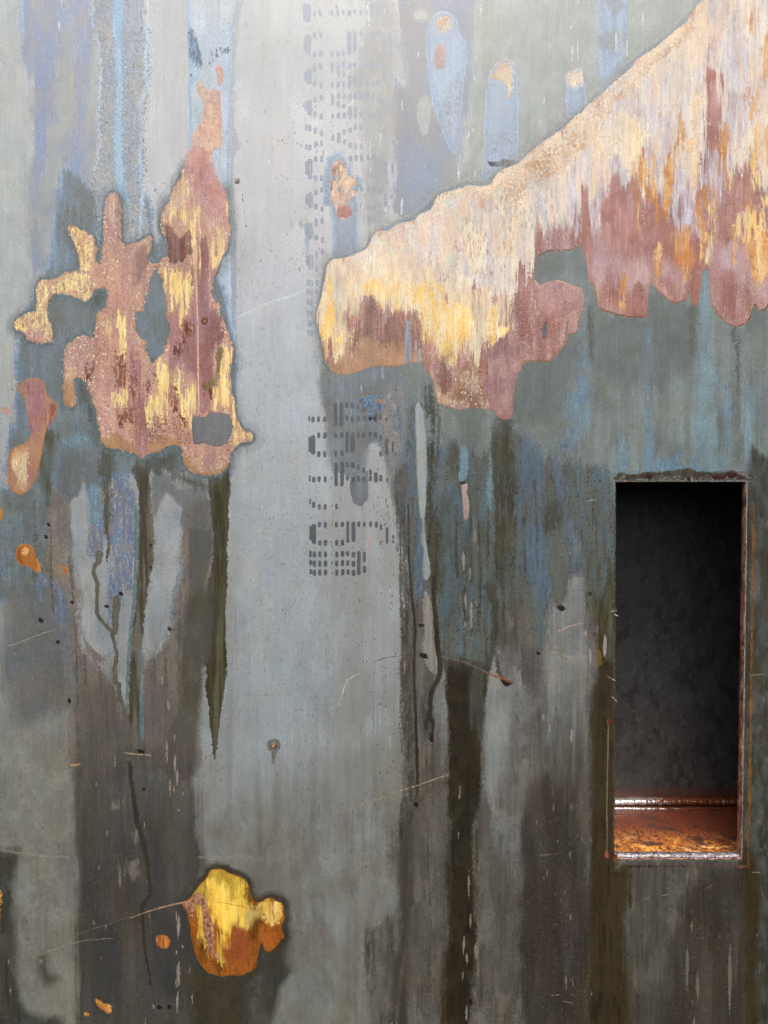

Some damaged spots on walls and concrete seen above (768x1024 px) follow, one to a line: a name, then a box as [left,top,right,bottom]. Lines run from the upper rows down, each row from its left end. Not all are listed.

rust [15,543,41,573]
leakage [481,672,489,697]
rust [605,505,756,869]
leakage [401,702,416,811]
leakage [471,812,480,904]
leakage [615,860,746,1024]
leakage [739,794,762,1024]